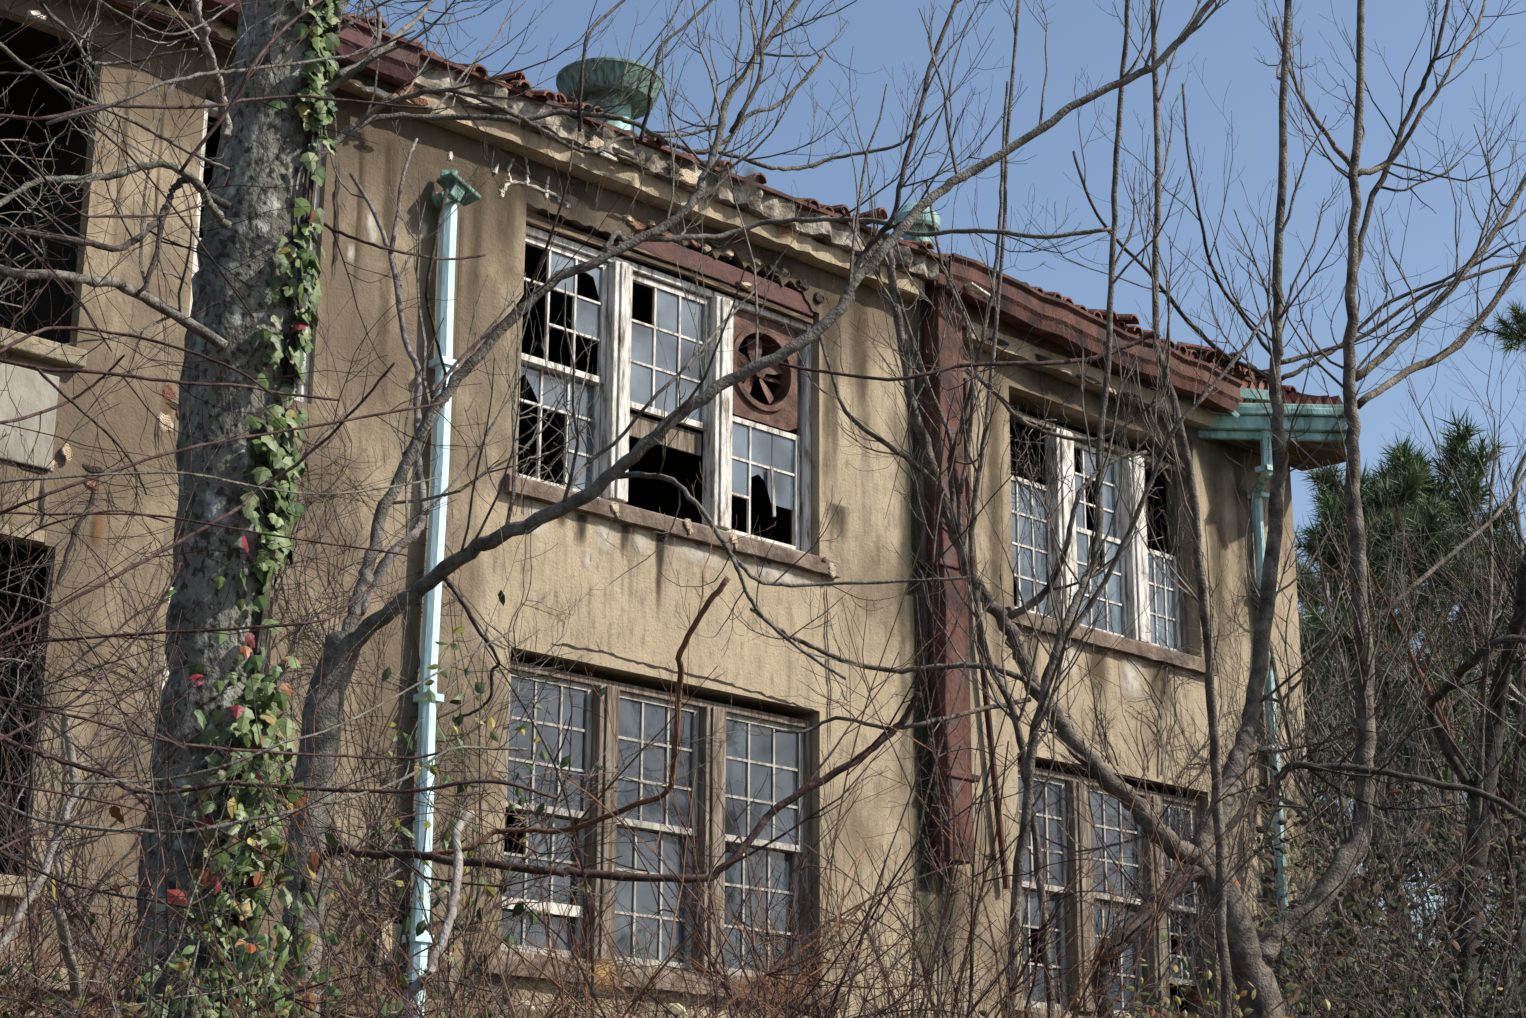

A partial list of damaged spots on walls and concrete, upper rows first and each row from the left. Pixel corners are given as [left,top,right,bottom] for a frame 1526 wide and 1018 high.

peeling [493,157,571,209]
spalling [587,135,698,186]
spalling [623,215,824,304]
leakage [832,504,845,527]
leakage [530,508,664,596]
leakage [685,544,711,561]
leakage [761,561,793,582]
leakage [1125,664,1168,700]